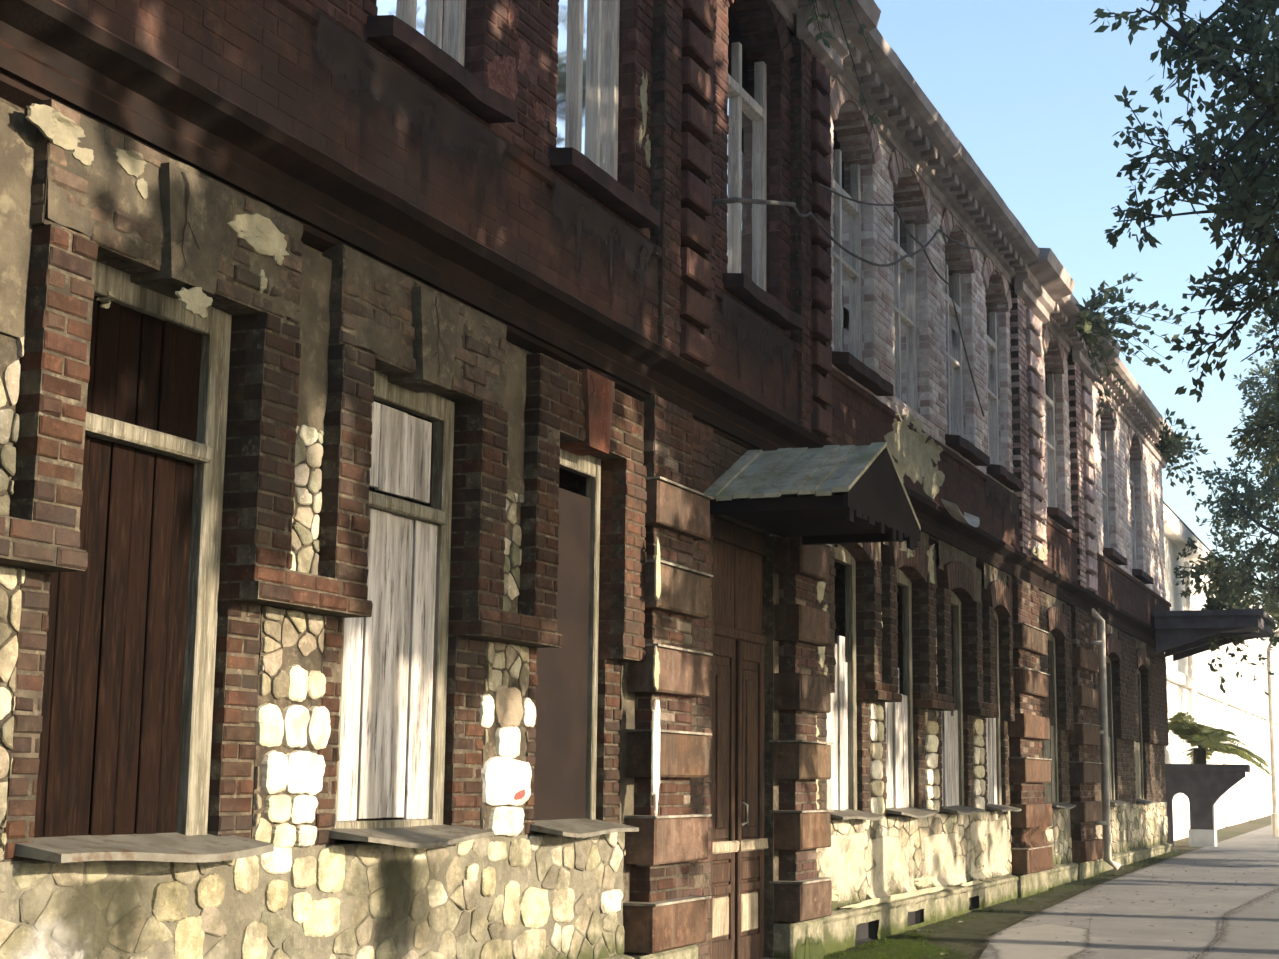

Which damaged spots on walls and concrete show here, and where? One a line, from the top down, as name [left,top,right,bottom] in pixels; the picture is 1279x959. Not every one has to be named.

flaking render [25,103,94,166]
flaking render [114,148,148,199]
crack [161,171,202,270]
flaking render [226,213,290,294]
damp [549,176,657,316]
peeling [96,291,117,309]
peeling [175,287,213,318]
flaking render [884,411,945,499]
flaking render [900,541,935,584]